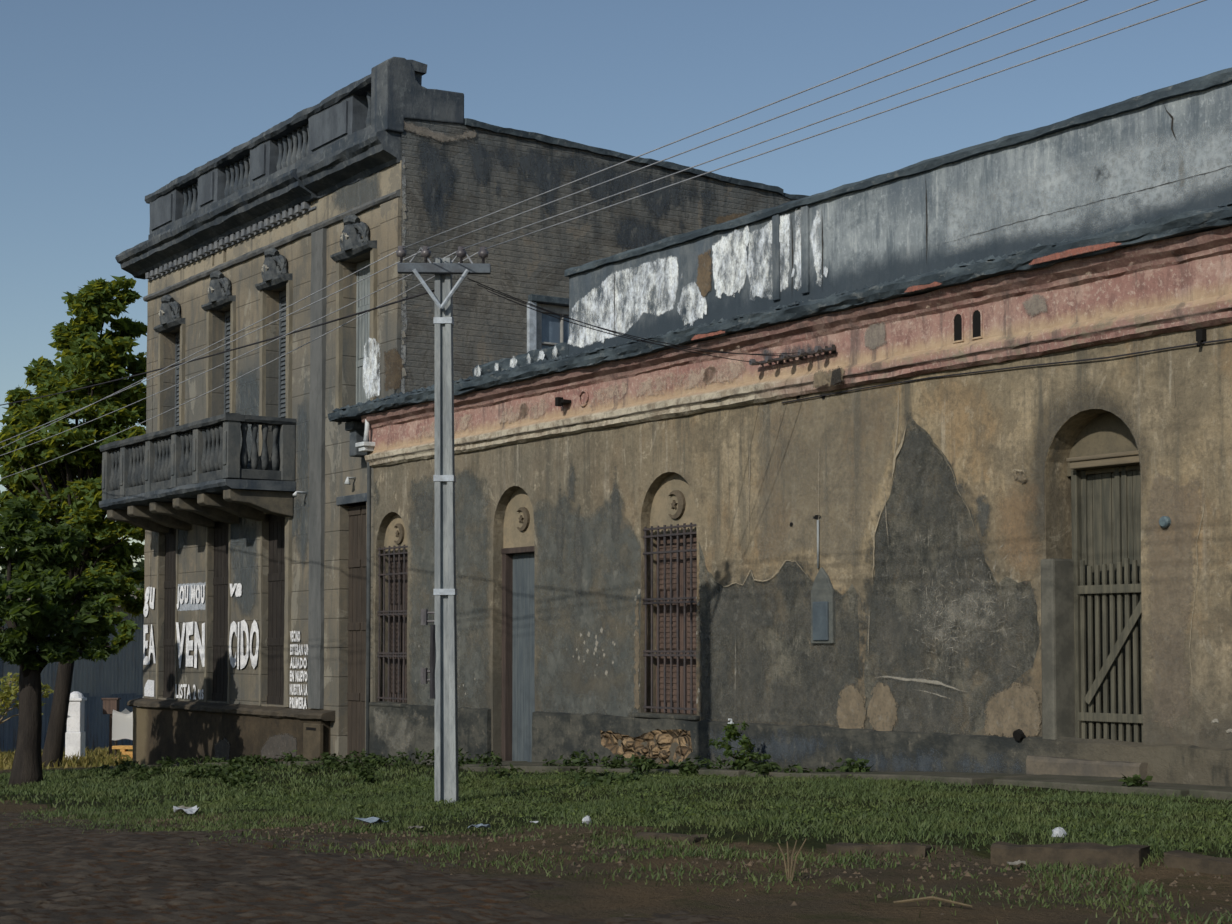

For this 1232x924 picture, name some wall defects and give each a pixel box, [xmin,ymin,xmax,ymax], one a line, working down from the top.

flaking render [363,274,407,398]
leakage [417,141,716,249]
peeling [495,209,828,371]
leakage [409,480,435,722]
leakage [455,471,489,708]
leakage [534,467,641,717]
flaking render [696,413,1041,735]